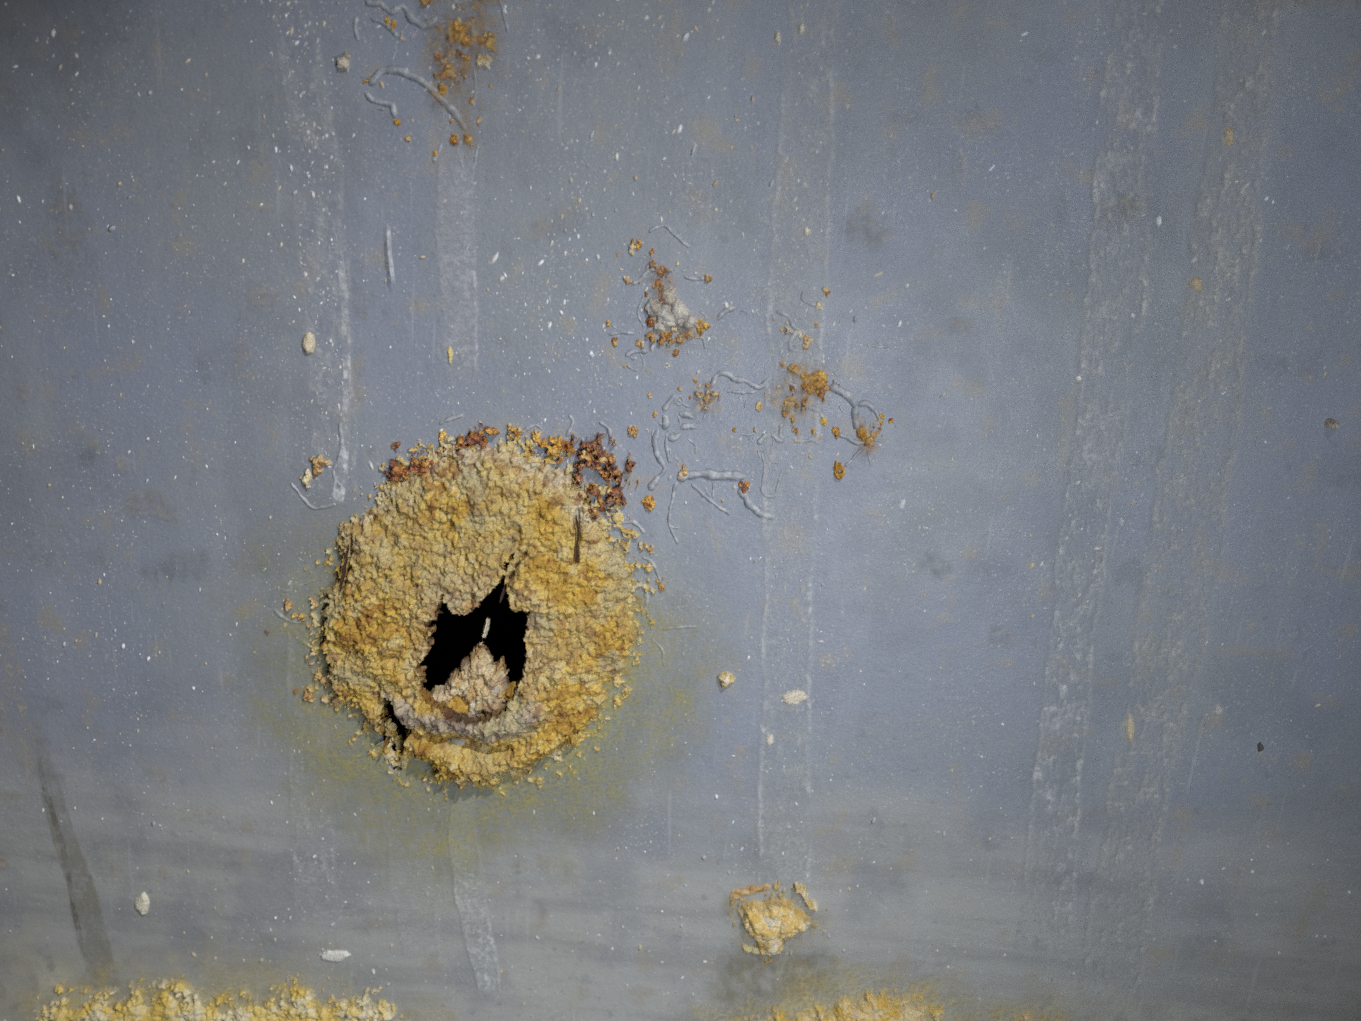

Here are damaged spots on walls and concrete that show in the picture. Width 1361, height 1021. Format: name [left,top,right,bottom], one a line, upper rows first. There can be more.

rust [336,0,509,171]
rust [264,224,897,863]
rust [24,973,405,1021]
rust [714,976,958,1021]